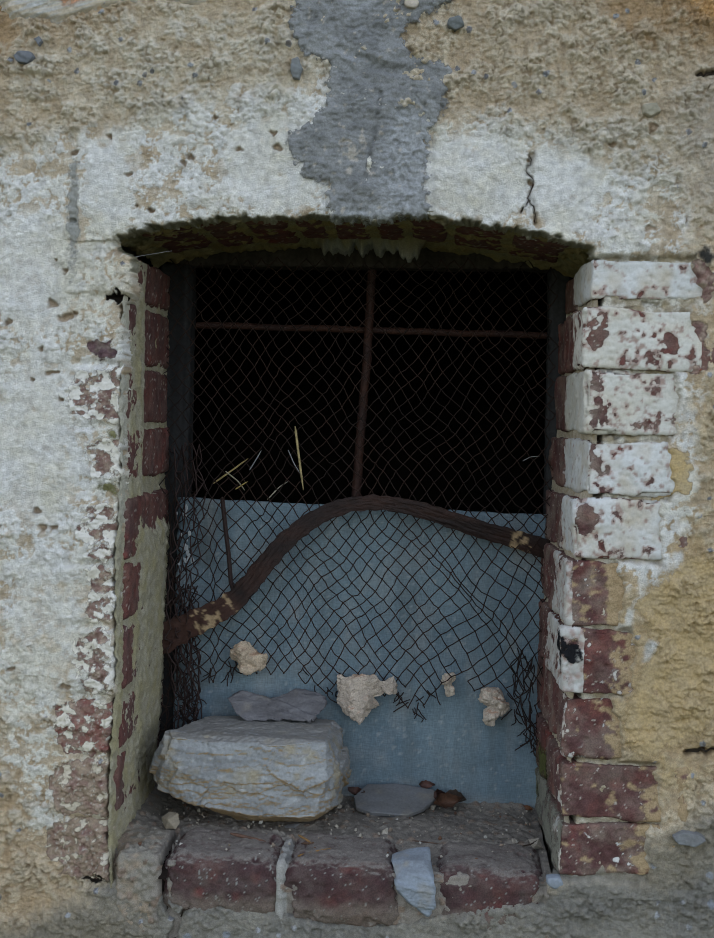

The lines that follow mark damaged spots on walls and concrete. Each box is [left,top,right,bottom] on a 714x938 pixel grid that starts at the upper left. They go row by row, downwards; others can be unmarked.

crack [697,69,714,77]
crack [521,156,536,222]
spalling [67,339,125,424]
spalling [84,436,125,482]
peeling [544,259,714,871]
crack [685,746,714,754]
crack [158,843,189,938]